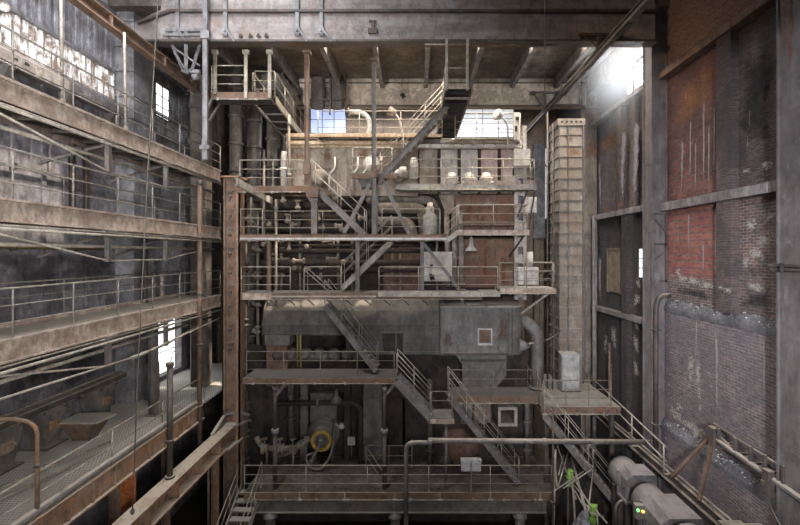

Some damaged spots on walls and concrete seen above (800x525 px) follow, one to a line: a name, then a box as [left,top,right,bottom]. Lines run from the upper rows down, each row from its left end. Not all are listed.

leakage [620,124,640,197]
efflorescence [681,103,715,181]
efflorescence [742,212,776,268]